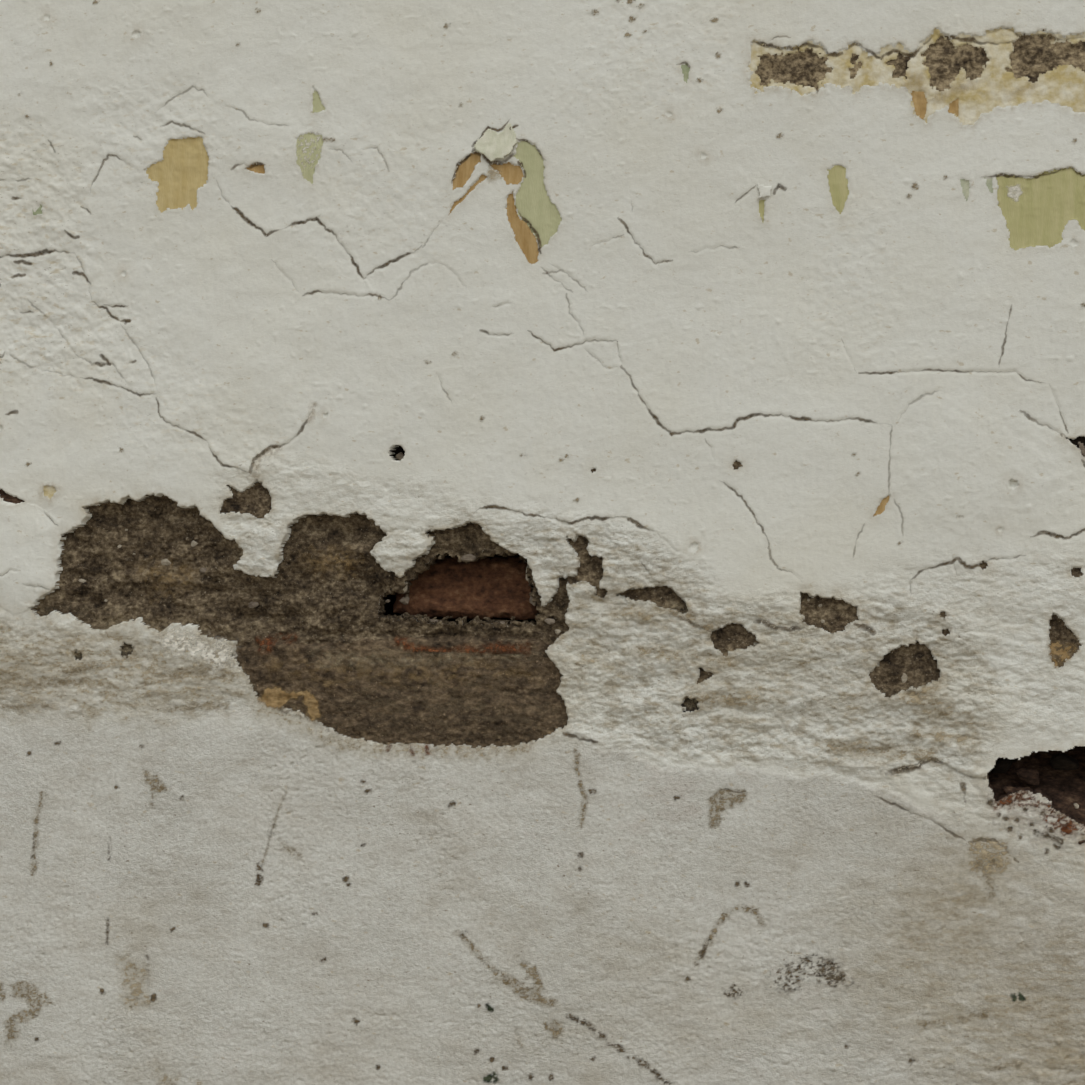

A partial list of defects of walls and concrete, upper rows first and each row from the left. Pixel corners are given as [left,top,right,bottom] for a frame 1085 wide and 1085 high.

peeling [748,27,1085,125]
peeling [449,122,562,264]
crack [233,207,331,236]
crack [10,233,79,277]
crack [351,253,410,297]
crack [632,383,811,436]
crack [568,516,643,528]
crack [918,558,982,573]
spalling [0,482,688,748]
spalling [799,593,859,633]
spalling [869,641,941,698]
spalling [987,746,1085,826]